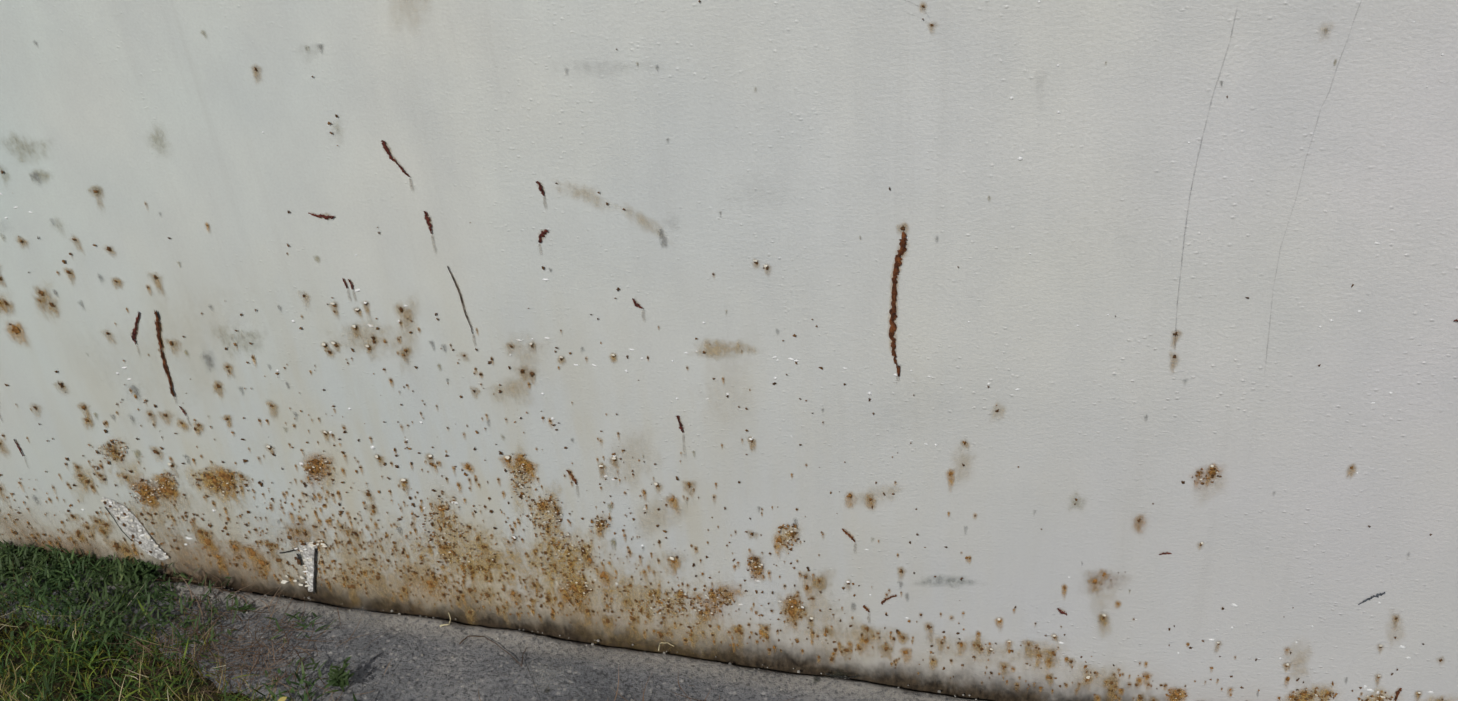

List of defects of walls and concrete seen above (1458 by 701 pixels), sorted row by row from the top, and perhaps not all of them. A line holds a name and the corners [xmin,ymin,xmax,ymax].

rust [381,140,410,180]
rust [322,278,419,369]
rust [440,266,534,398]
rust [889,226,907,376]
rust [0,308,1260,701]